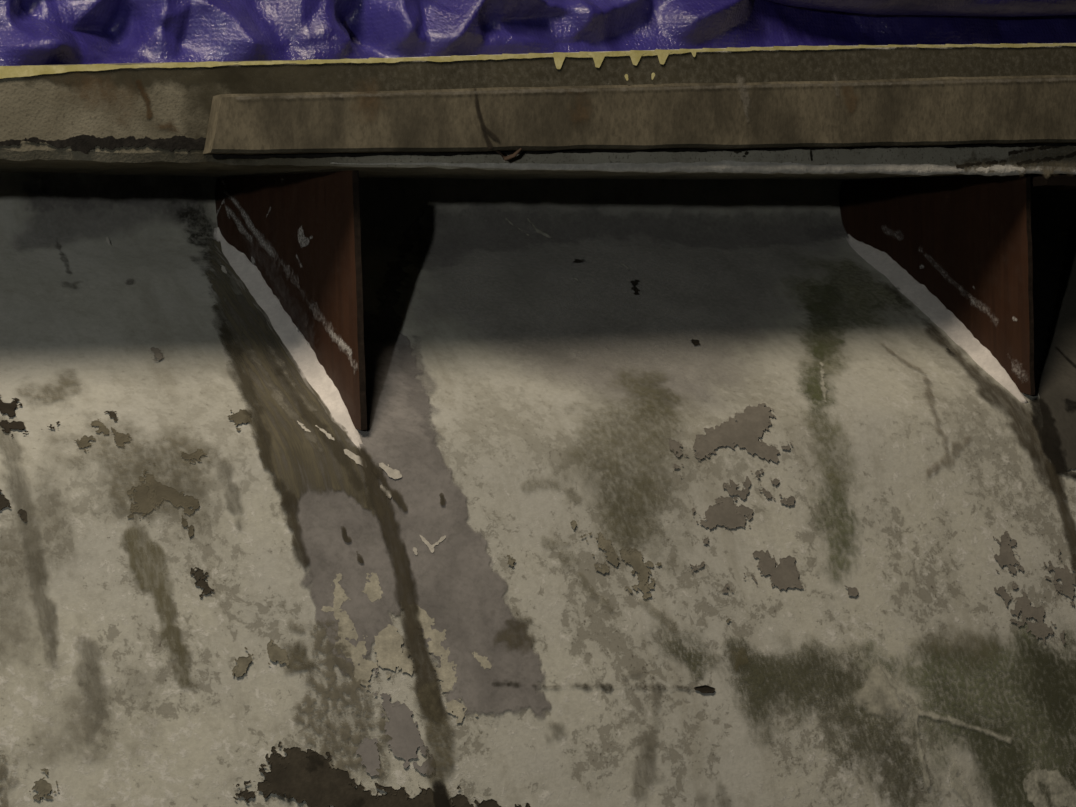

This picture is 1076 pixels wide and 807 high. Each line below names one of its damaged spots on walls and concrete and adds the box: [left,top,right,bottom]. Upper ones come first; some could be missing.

crack [0,134,206,154]
peeling [0,395,28,437]
peeling [668,403,795,544]
peeling [226,201,551,807]
damp [74,410,207,685]
damp [190,567,214,598]
damp [215,310,454,807]
peeling [744,550,803,590]
peeling [992,531,1066,645]
crack [496,683,612,691]
crack [643,685,715,693]
peeling [1023,769,1076,807]